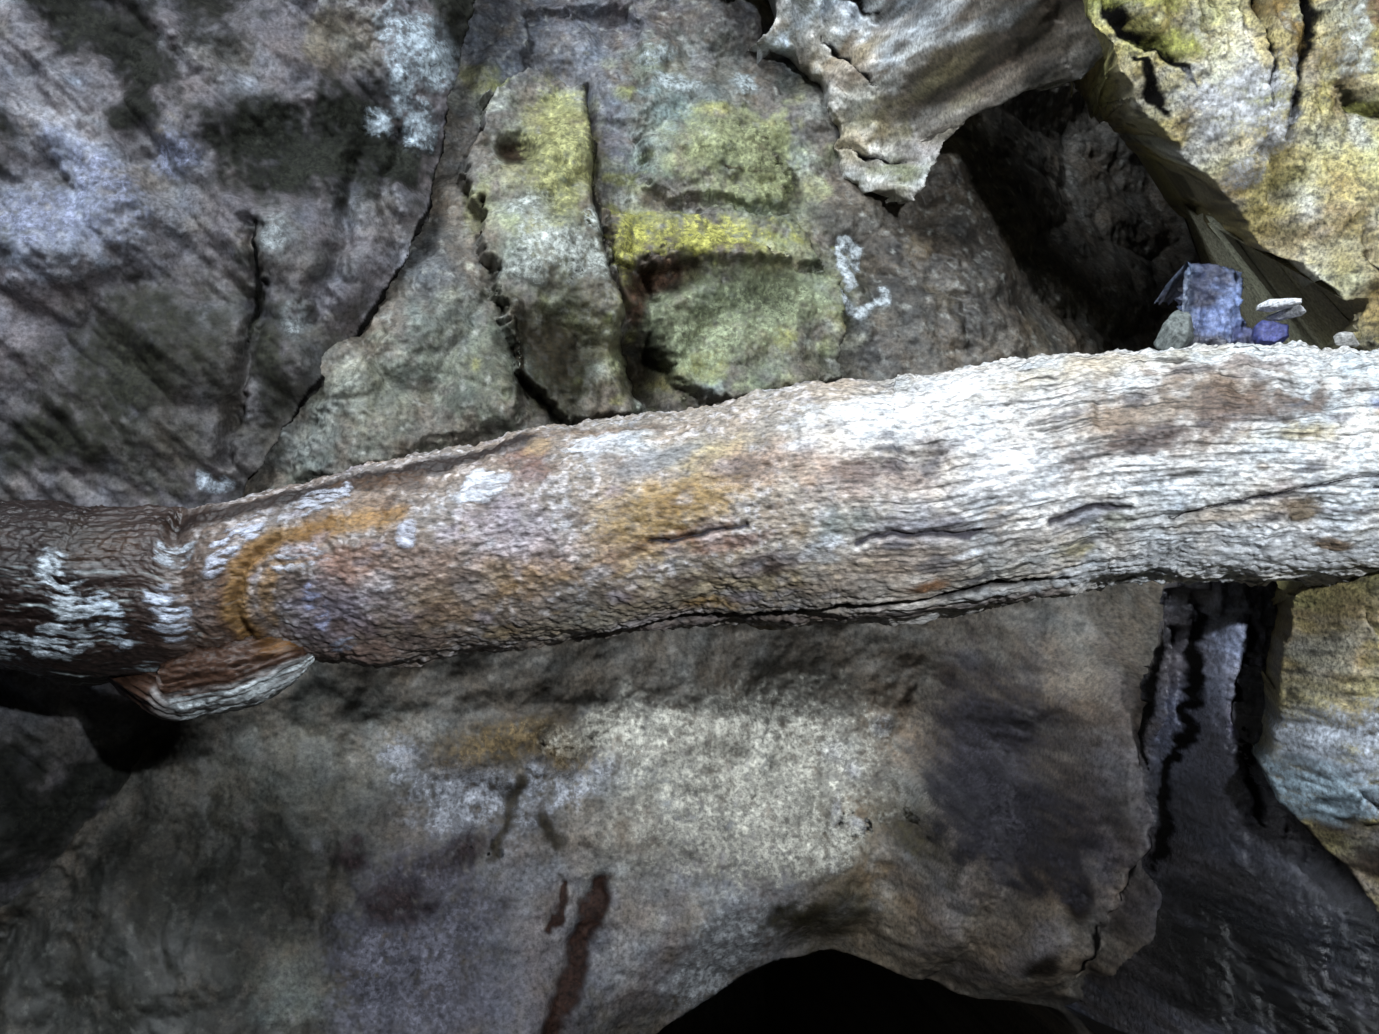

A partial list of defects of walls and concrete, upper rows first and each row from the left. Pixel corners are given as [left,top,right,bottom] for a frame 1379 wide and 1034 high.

crack [247,220,263,342]
crack [355,110,449,337]
crack [286,375,325,426]